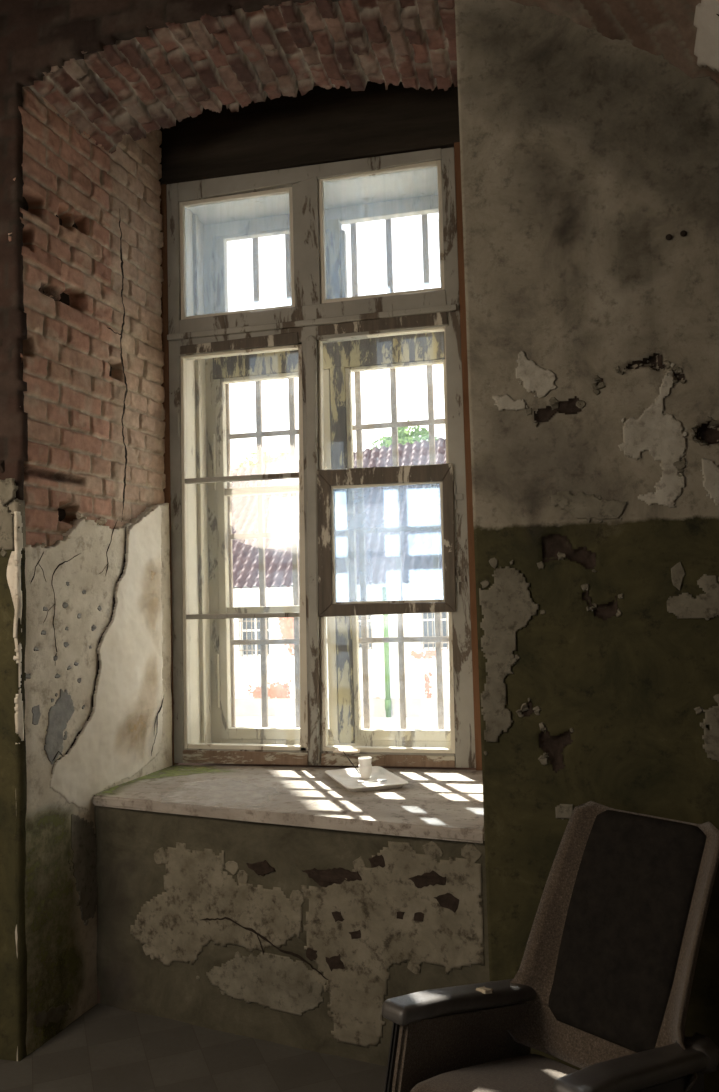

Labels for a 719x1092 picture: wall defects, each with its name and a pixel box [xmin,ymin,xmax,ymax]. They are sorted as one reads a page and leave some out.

crack [31,208,128,774]
flaking render [0,86,166,765]
peeling [479,557,574,773]
peeling [492,351,605,427]
peeling [613,353,719,508]
peeling [667,562,719,620]
crack [201,917,328,980]
peeling [130,841,484,1048]